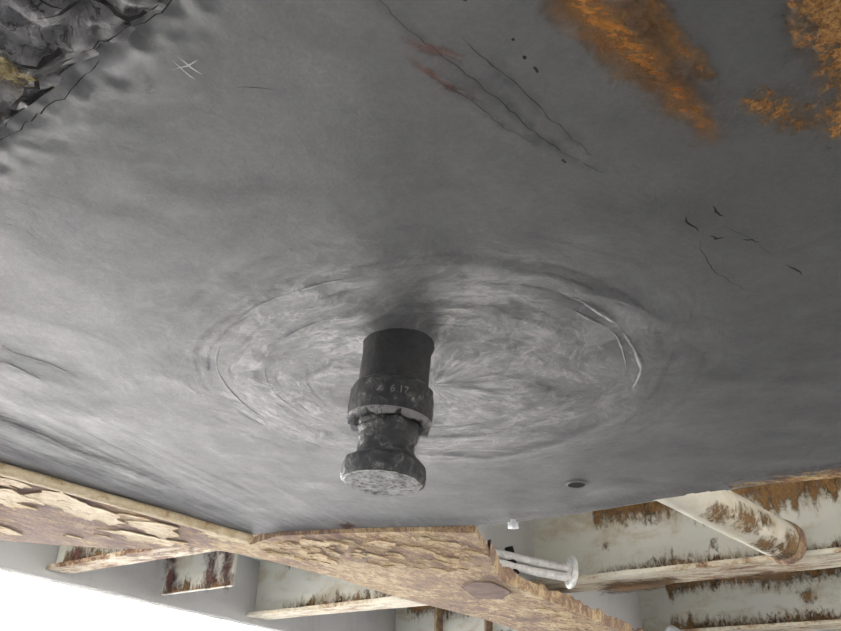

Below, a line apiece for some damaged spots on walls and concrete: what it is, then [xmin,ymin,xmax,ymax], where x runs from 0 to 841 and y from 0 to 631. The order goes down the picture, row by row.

crack [0,0,172,140]
rust [551,0,718,140]
rust [741,0,841,139]
peeling [0,477,189,546]
peeling [197,531,251,543]
peeling [262,536,488,573]
rust [592,478,841,573]
peeling [462,582,511,599]
rust [603,567,841,630]